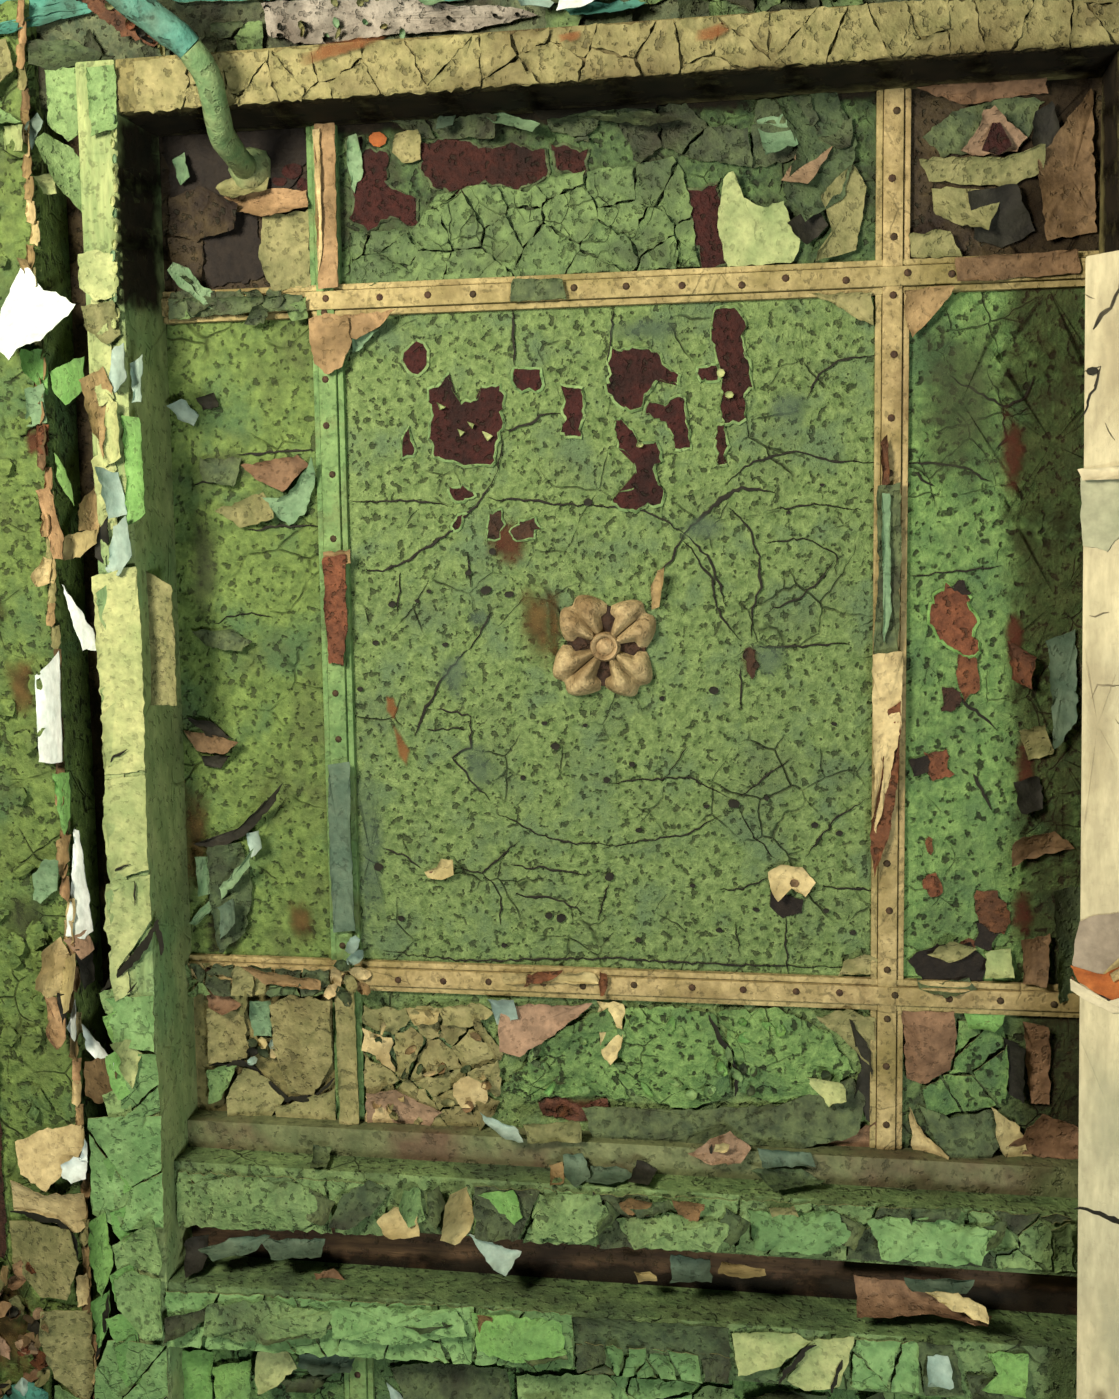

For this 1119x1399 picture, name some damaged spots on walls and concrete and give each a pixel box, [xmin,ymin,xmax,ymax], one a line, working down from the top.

crack [133,0,1119,114]
peeling [162,92,874,374]
peeling [904,78,1097,338]
rust [881,435,890,488]
rust [322,549,351,666]
crack [350,413,874,925]
rust [870,651,954,878]
crack [387,920,843,974]
rust [960,890,1011,951]
peeling [176,1009,1079,1327]
crack [1075,1207,1119,1224]
peeling [732,1332,965,1399]